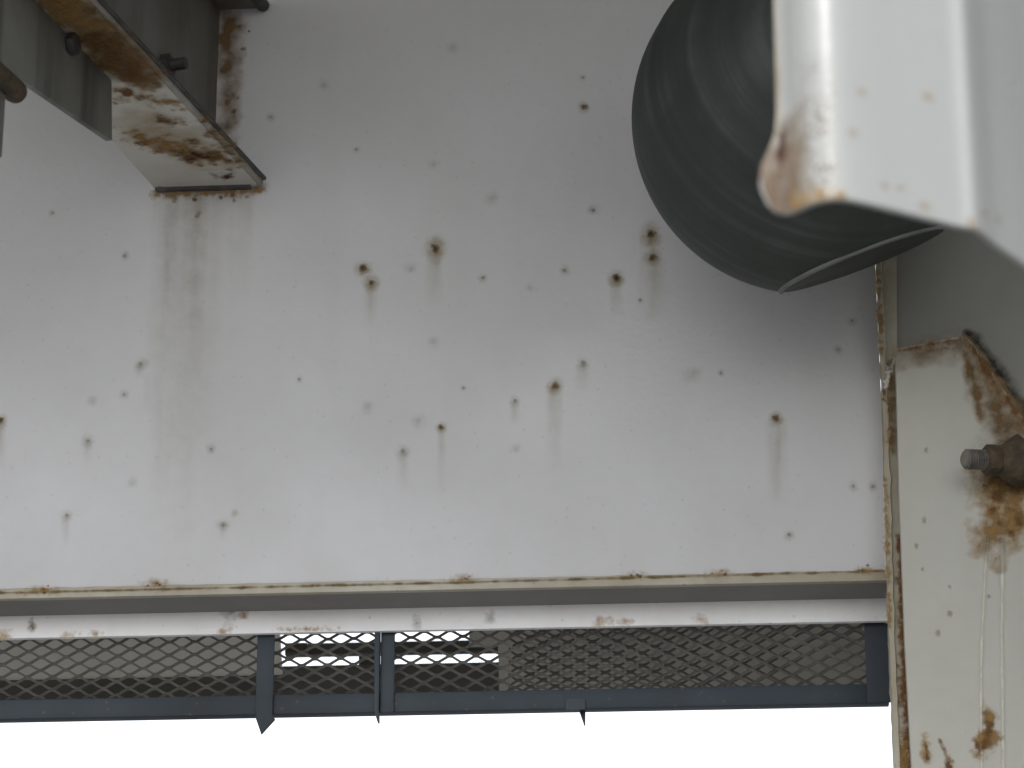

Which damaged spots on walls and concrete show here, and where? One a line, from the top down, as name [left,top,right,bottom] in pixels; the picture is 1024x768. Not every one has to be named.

corrosion [37,0,265,202]
corrosion [760,126,846,213]
corrosion [970,470,1024,572]
corrosion [0,580,204,594]
corrosion [267,577,498,588]
corrosion [849,477,953,768]
corrosion [975,709,1001,758]